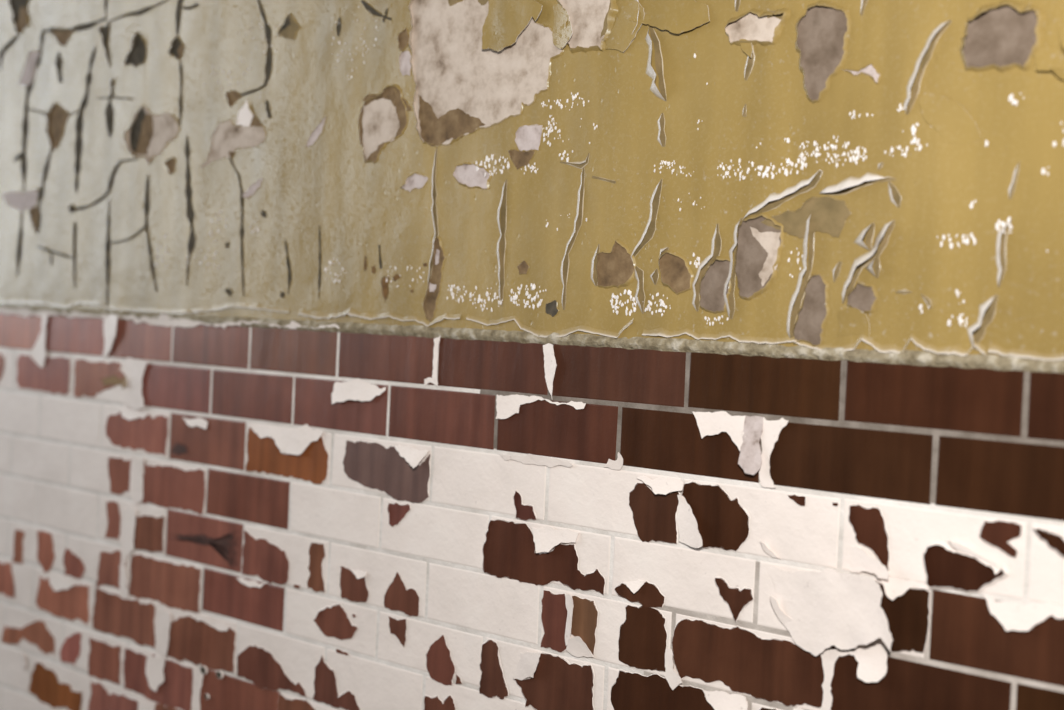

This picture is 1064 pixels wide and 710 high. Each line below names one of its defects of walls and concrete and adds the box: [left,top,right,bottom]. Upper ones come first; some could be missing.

crack [240,0,273,118]
crack [361,0,392,23]
flaking render [358,0,645,170]
crack [0,0,199,311]
crack [230,157,245,296]
crack [284,239,292,294]
crack [316,225,324,299]
peeling [0,306,369,710]
peeling [343,440,431,527]
peeling [692,411,788,488]
peeling [479,476,1064,710]
peeling [424,634,463,710]